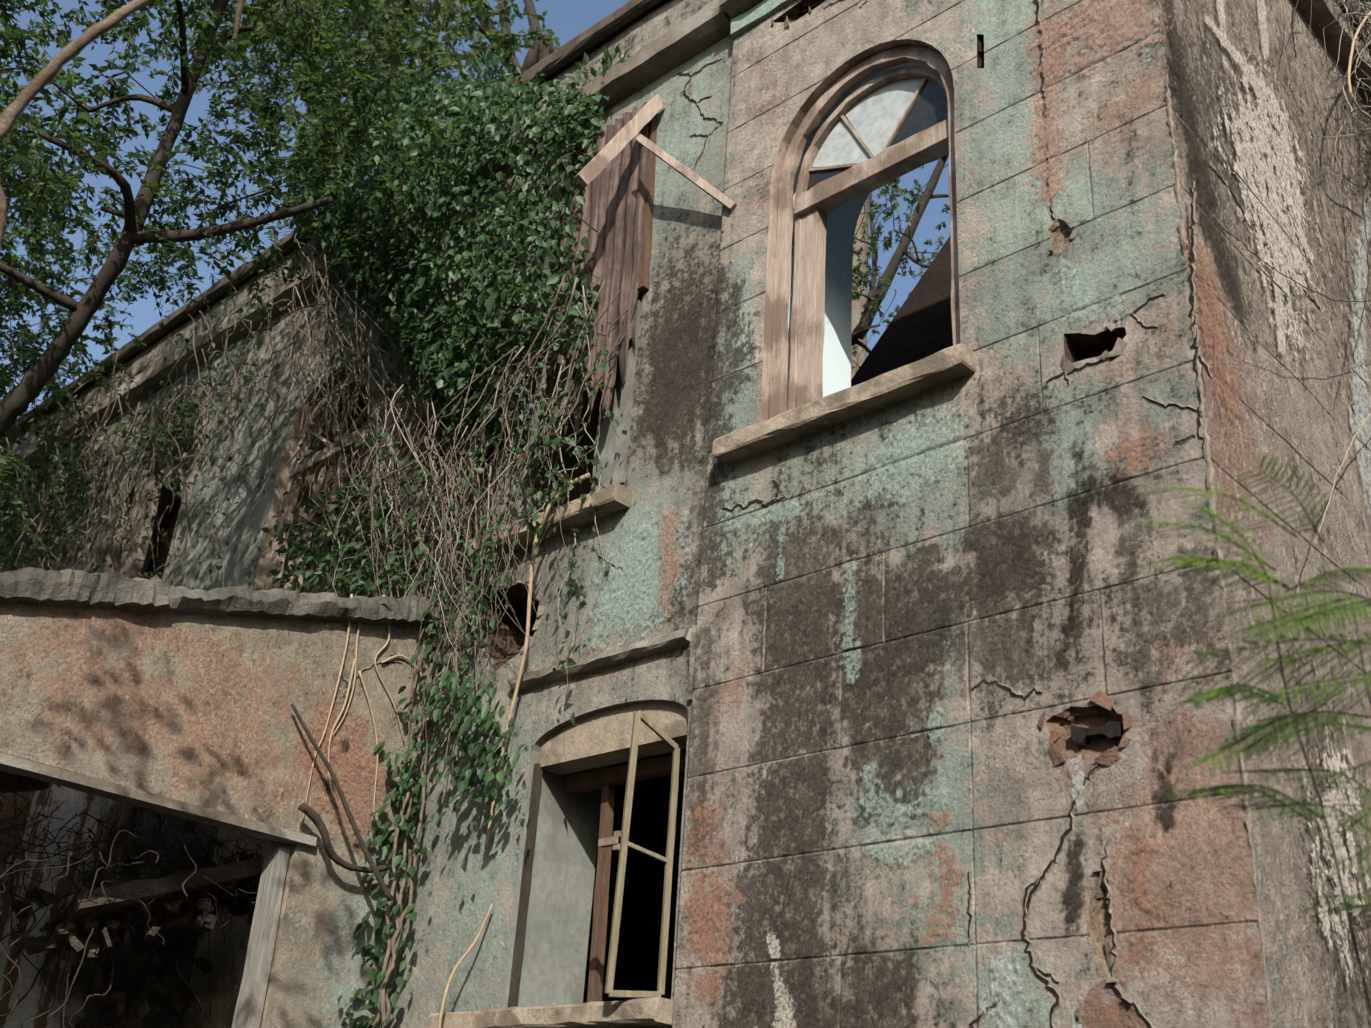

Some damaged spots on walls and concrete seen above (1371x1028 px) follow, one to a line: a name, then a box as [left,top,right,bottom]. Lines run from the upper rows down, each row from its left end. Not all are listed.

crack [676,58,723,172]
crack [1032,0,1055,220]
damp [1157,0,1260,348]
damp [1204,0,1271,101]
spalling [1048,218,1128,375]
crack [1114,161,1321,449]
damp [631,265,762,593]
hole [481,580,545,671]
damp [711,427,1244,1028]
spalling [1037,690,1133,810]
crack [1020,764,1102,1028]
spalling [1070,864,1150,1028]